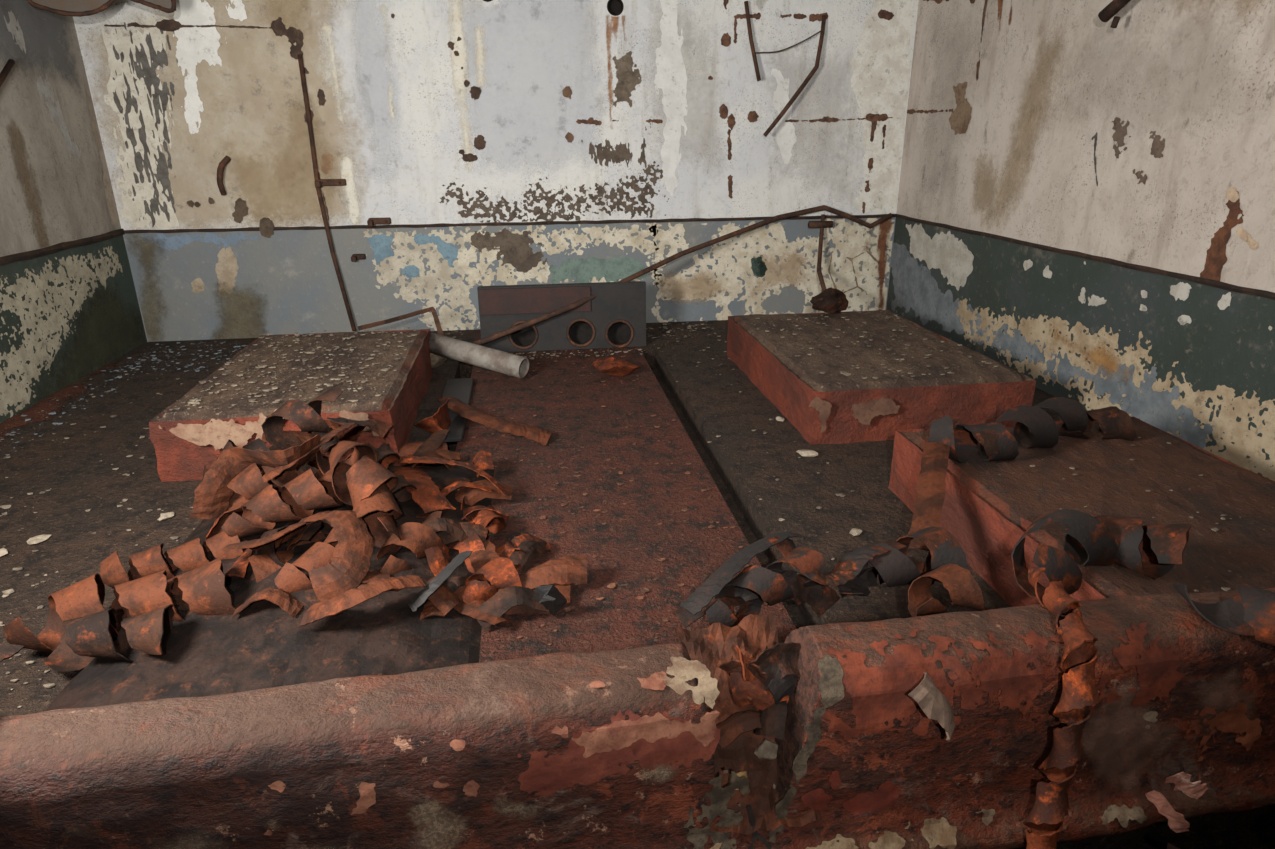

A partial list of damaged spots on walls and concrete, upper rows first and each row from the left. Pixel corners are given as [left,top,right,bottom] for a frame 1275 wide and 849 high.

corrosion [576,16,625,125]
peeling [364,0,1275,481]
corrosion [1200,191,1244,281]
corrosion [534,585,567,616]